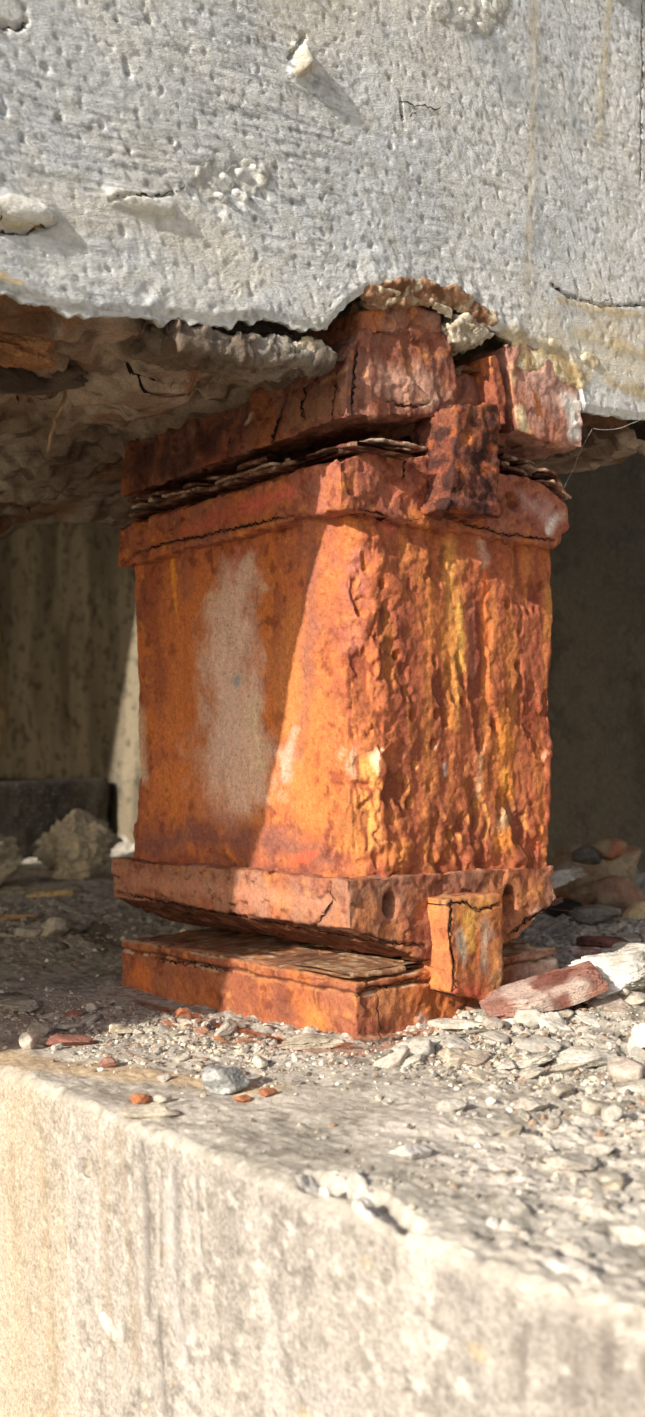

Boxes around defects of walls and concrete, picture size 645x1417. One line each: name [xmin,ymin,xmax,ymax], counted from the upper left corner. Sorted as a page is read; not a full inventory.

crack [551,283,645,307]
spalling [128,318,339,383]
corrosion [127,438,428,519]
corrosion [498,453,571,501]
corrosion [131,929,423,978]
corrosion [133,1000,287,1044]
corrosion [340,1029,419,1047]